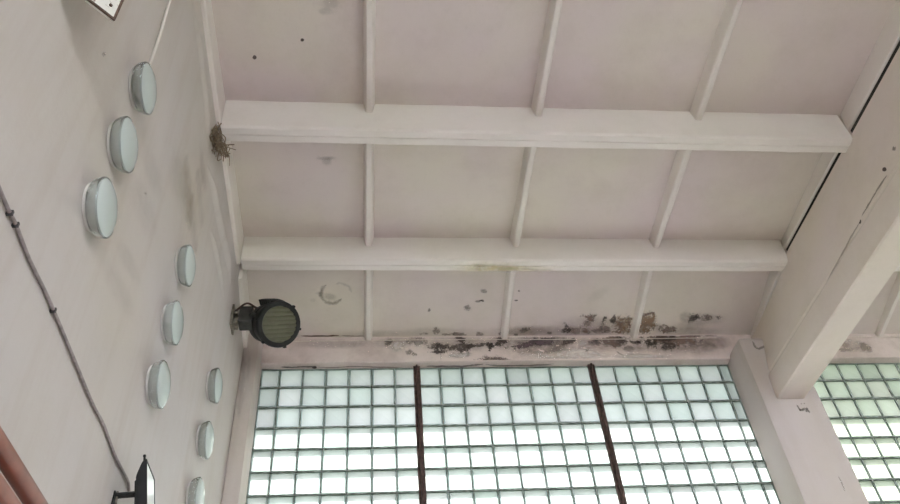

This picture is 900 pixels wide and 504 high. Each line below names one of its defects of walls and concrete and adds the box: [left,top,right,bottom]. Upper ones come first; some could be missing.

water stain [428,314,713,354]